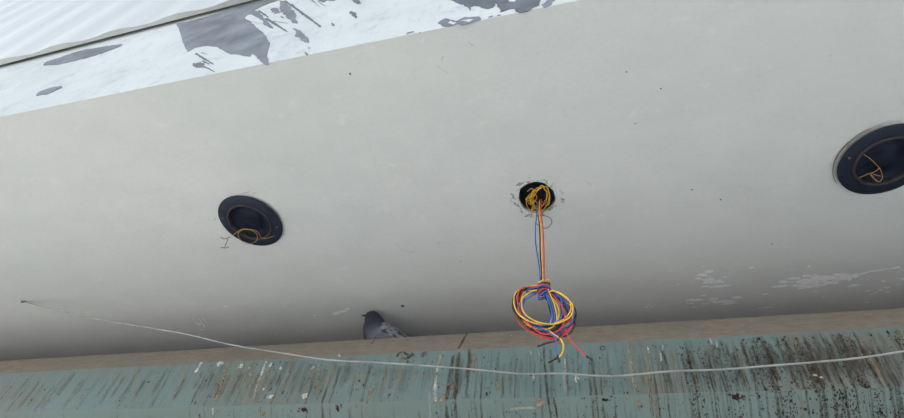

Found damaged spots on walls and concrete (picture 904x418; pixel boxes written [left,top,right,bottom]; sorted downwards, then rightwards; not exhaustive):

peeling [438,0,555,27]
peeling [177,0,334,72]
peeling [43,44,123,66]
peeling [36,86,62,96]
peeling [771,265,904,303]